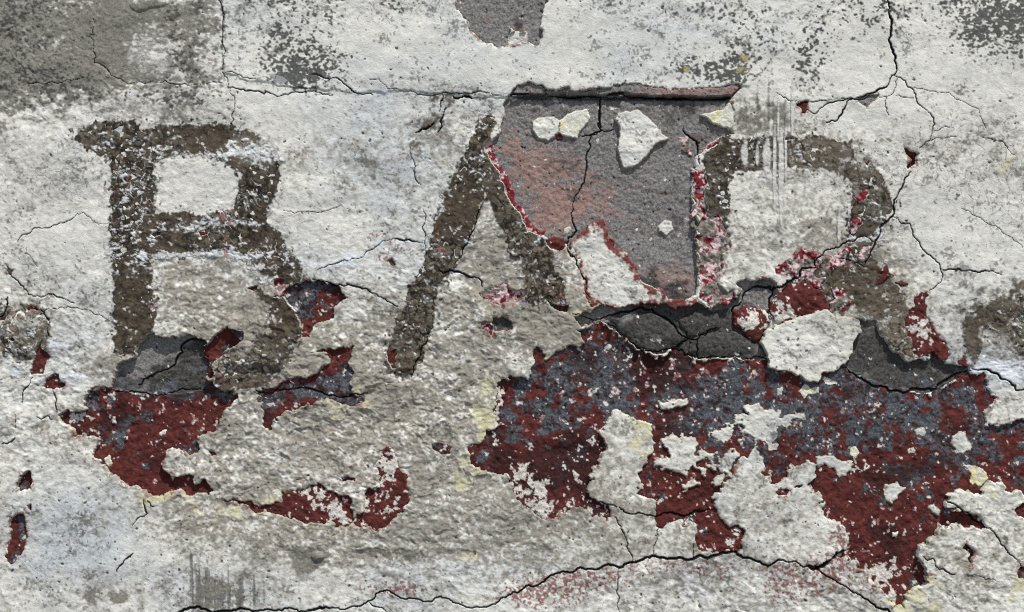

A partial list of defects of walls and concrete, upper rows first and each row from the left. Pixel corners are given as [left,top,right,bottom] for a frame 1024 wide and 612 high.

spalling [455,0,548,47]
crack [779,0,1015,155]
crack [30,2,730,289]
peeling [60,327,244,496]
peeling [274,278,346,337]
peeling [257,346,371,430]
peeling [468,83,1024,606]
crack [575,172,1002,361]
crack [845,367,1024,394]
peeling [232,446,410,531]
crack [180,504,890,612]
crack [947,501,1022,567]